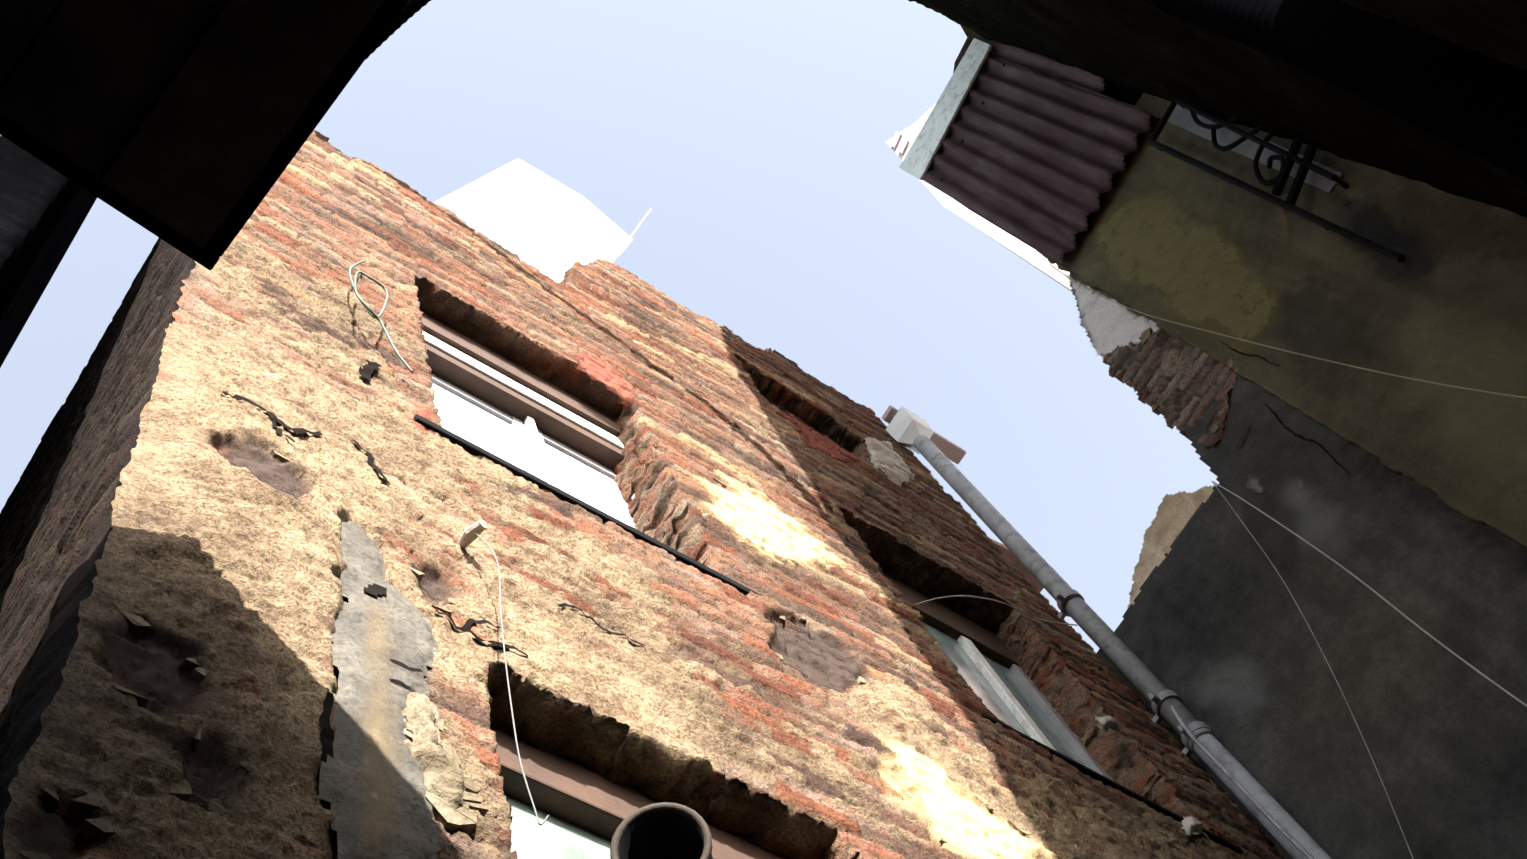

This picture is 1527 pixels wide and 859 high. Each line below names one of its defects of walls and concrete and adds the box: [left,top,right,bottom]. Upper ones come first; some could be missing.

peeling [1066,195,1279,447]
crack [1219,339,1279,366]
spalling [222,438,308,501]
crack [220,390,390,485]
crack [1264,403,1351,475]
spalling [410,566,456,615]
spalling [769,611,870,692]
spalling [94,612,253,816]
flaking render [401,688,489,835]